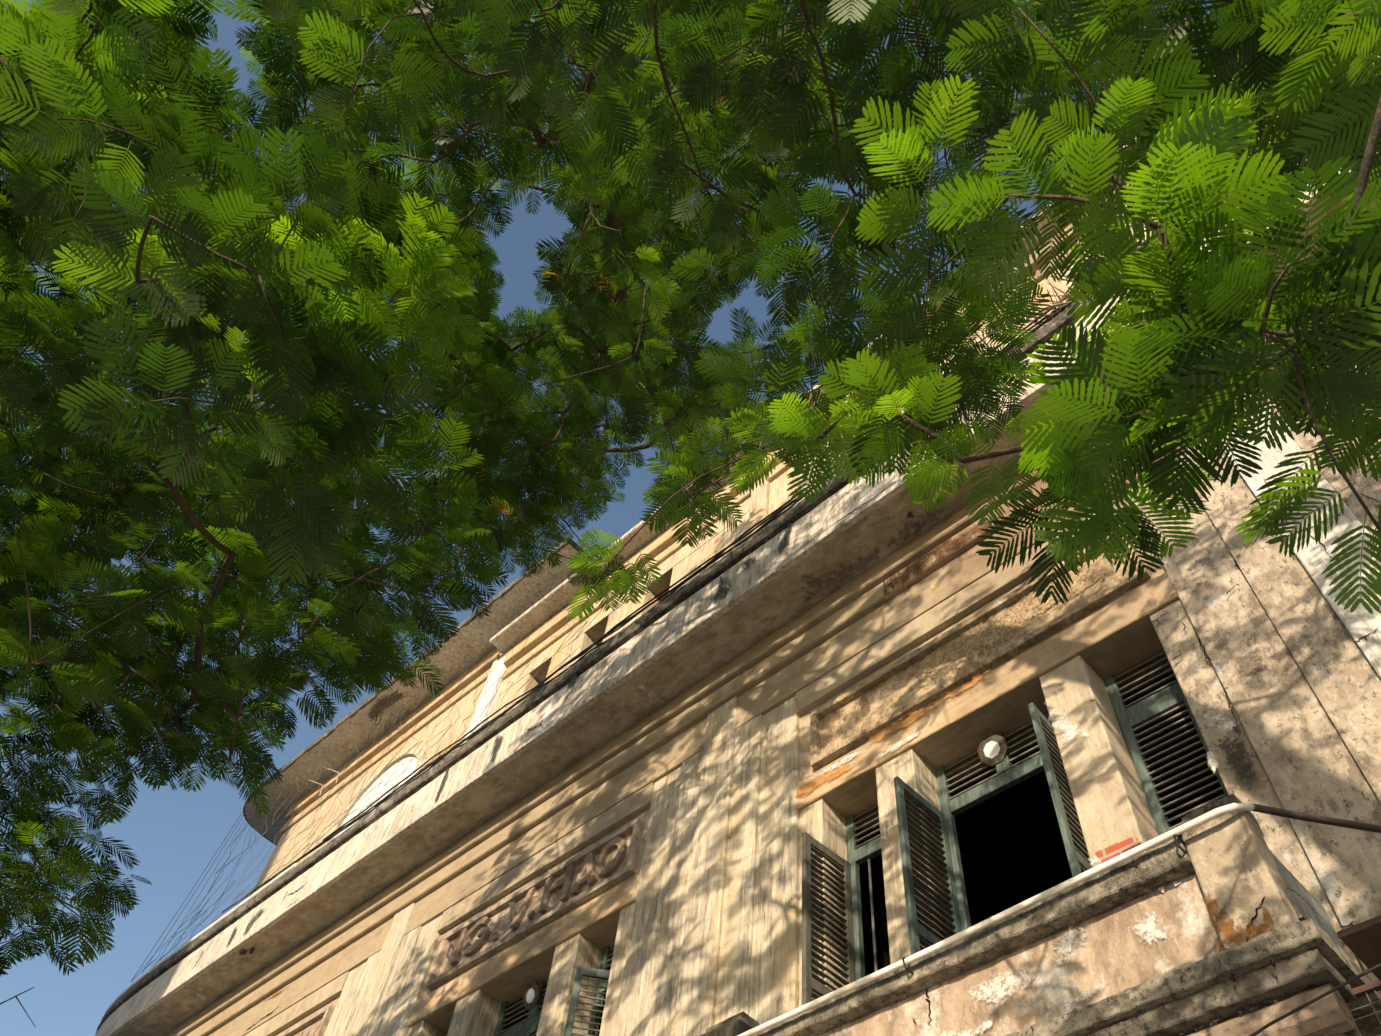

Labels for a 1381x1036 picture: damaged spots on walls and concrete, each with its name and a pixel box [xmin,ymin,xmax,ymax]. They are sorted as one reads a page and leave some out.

crack [1150,614,1237,722]
corrosion [1204,895,1274,952]
crack [1246,887,1354,971]
crack [913,988,932,1030]